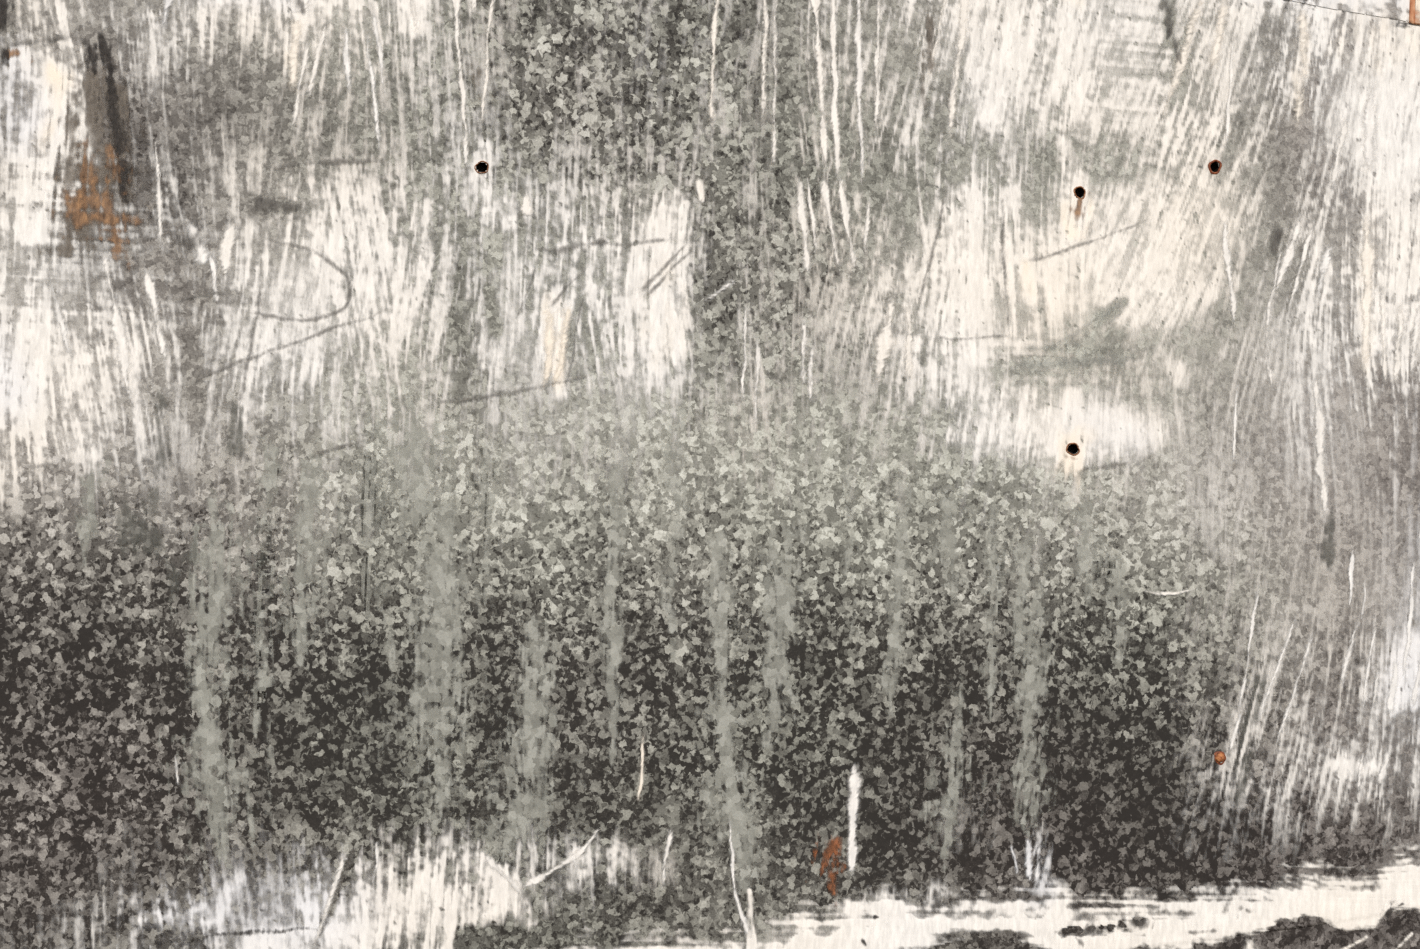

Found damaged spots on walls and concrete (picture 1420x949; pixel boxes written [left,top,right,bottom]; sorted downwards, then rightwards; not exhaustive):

rust [66,143,139,254]
rust [814,837,846,895]